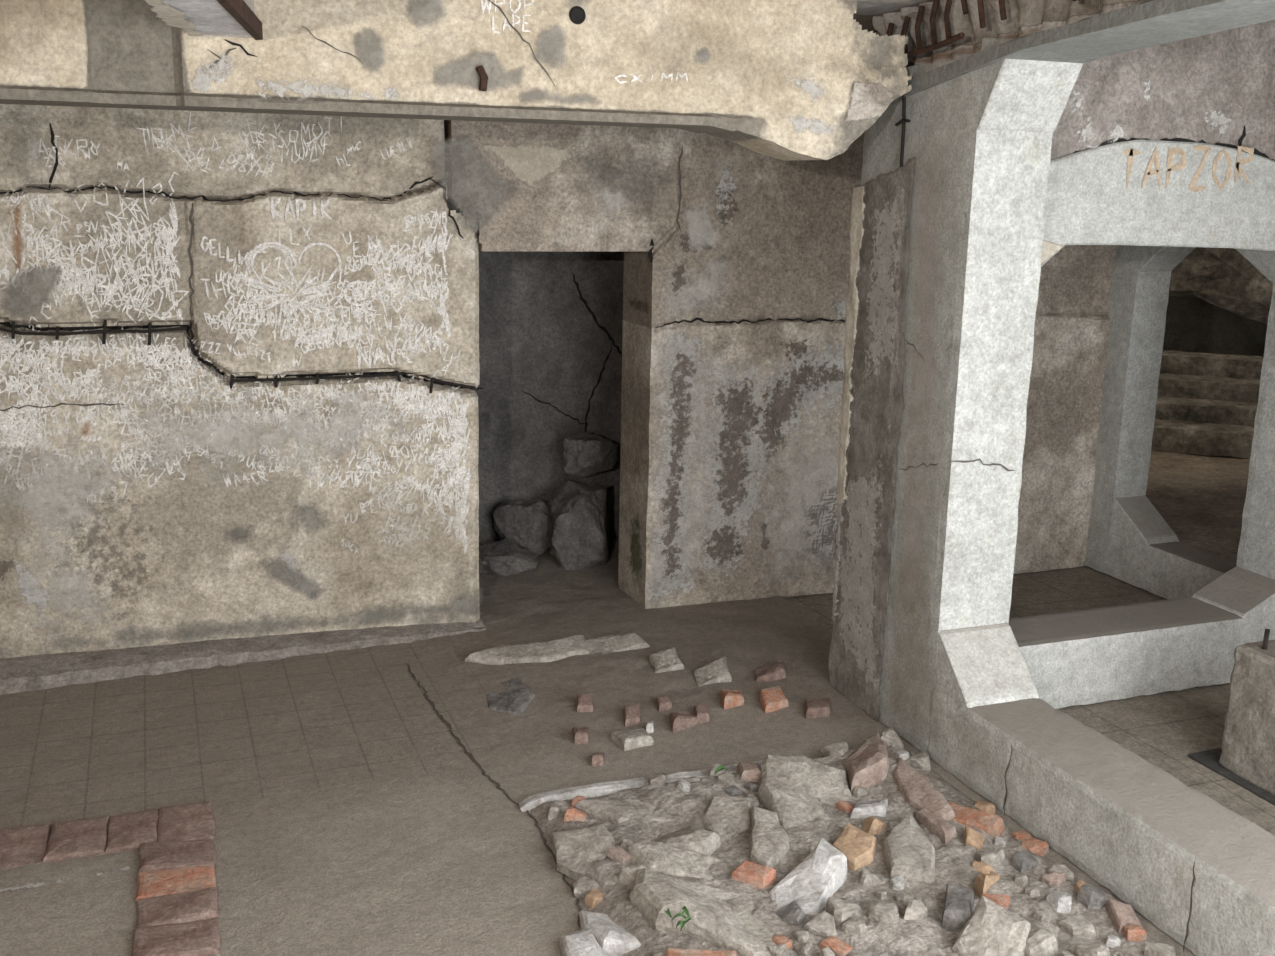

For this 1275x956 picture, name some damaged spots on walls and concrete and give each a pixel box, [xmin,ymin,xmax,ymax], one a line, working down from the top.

spalling [872,0,1138,66]
crack [0,123,484,393]
crack [523,273,622,432]
crack [656,318,846,328]
water stain [761,430,840,579]
crack [1003,745,1012,816]
crack [1183,861,1195,953]